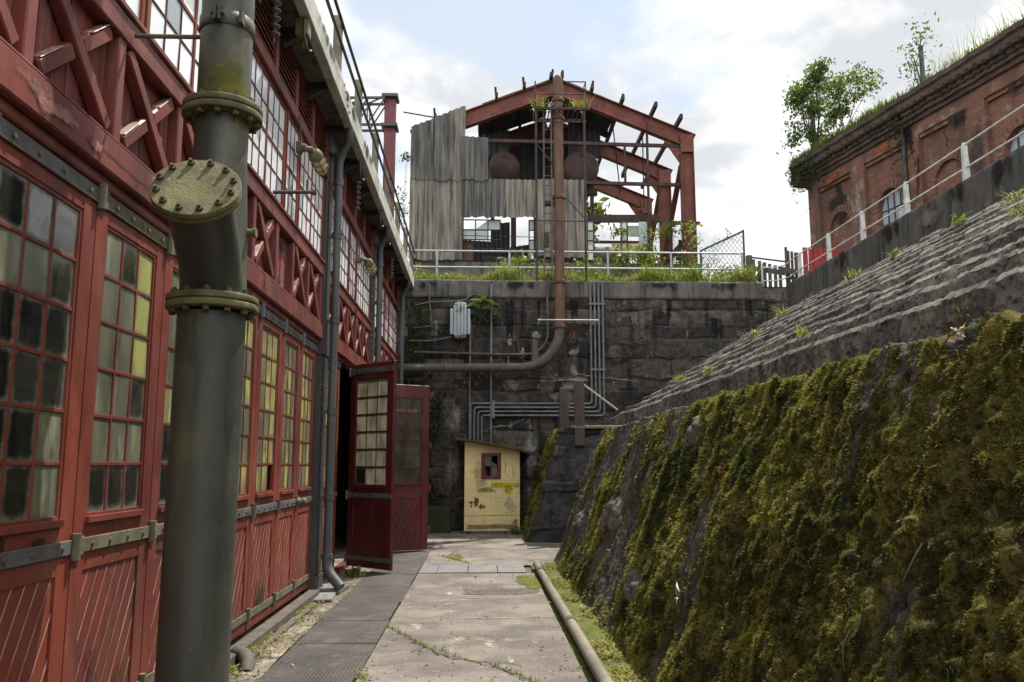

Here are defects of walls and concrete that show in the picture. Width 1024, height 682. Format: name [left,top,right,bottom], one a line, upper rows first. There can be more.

peeling [19,69,80,128]
leakage [970,126,1011,185]
leakage [830,185,847,225]